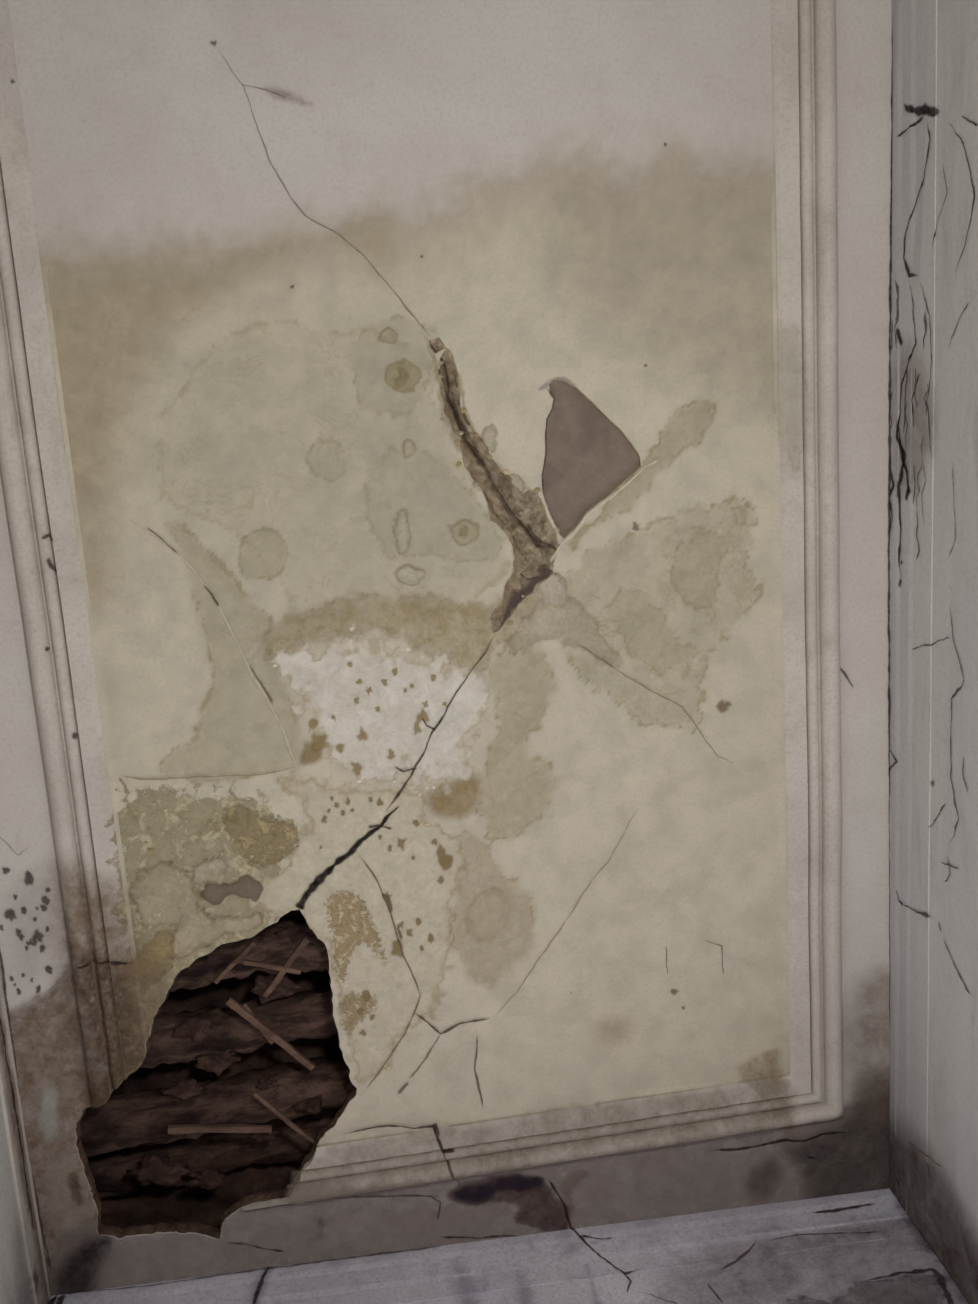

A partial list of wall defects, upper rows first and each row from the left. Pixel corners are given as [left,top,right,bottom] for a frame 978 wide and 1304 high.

crack [42,533,57,572]
crack [119,528,301,794]
leakage [42,169,790,1147]
crack [229,66,630,1105]
spalling [540,378,658,560]
crack [888,15,977,1011]
leakage [0,871,50,952]
peeling [76,624,489,1238]
crack [0,951,515,1304]
leakage [6,987,978,1304]